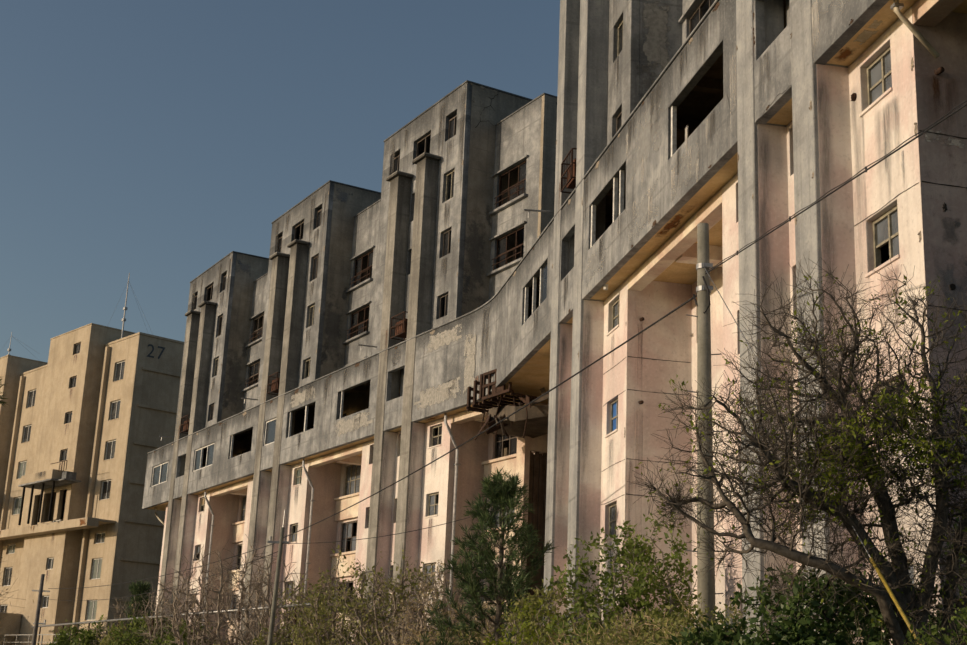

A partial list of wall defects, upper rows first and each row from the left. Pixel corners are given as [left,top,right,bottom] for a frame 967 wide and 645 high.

peeling [643,1,670,69]
peeling [414,323,476,410]